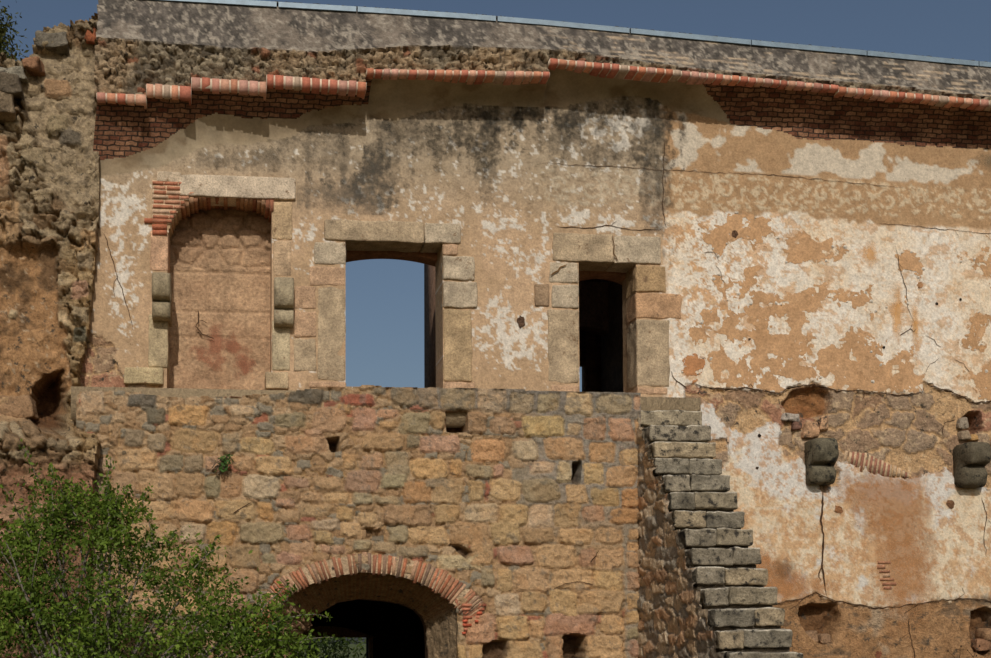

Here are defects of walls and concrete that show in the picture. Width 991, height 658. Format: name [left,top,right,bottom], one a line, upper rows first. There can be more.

water stain [325,148,392,214]
crack [102,232,133,327]
peeling [698,210,849,264]
peeling [895,250,925,288]
peeling [957,234,991,288]
spalling [681,265,991,493]
crack [778,495,990,658]
flaking render [877,561,896,589]